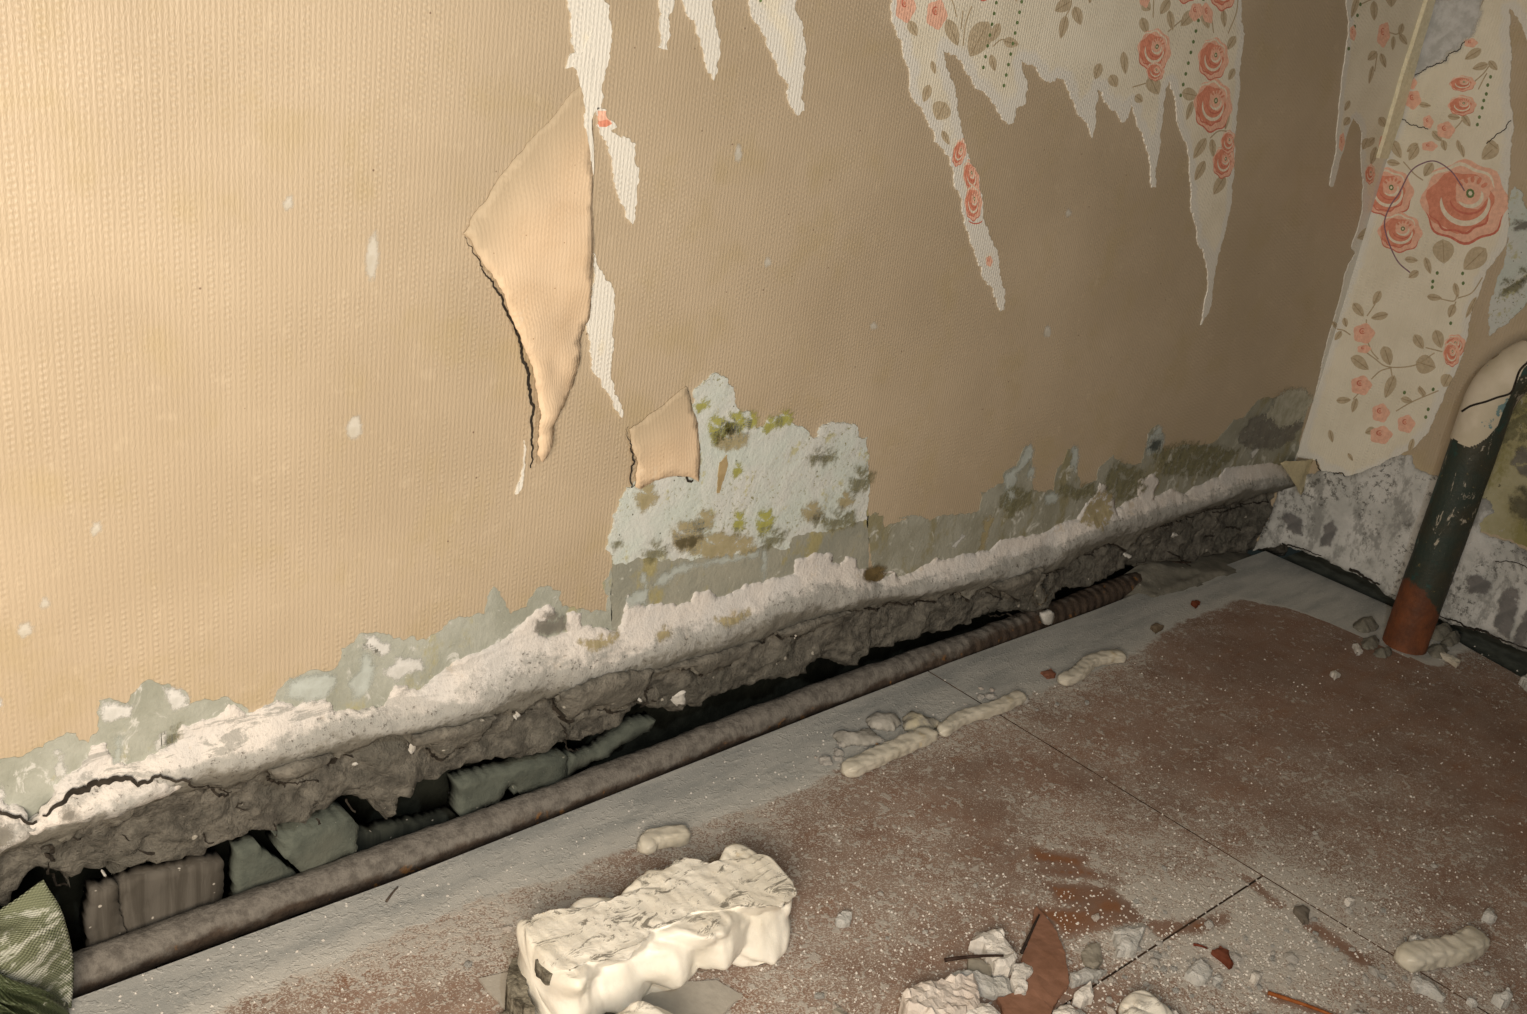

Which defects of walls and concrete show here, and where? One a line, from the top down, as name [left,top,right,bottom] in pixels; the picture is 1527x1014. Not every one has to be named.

peeling [565,0,612,128]
peeling [658,0,721,81]
peeling [748,0,806,116]
leakage [635,483,660,511]
leakage [644,508,785,563]
leakage [696,400,793,478]
peeling [272,390,1308,711]
leakage [801,467,876,531]
leakage [1480,393,1527,547]
leakage [1452,575,1527,645]
spalling [0,492,1289,906]
crack [0,754,356,886]